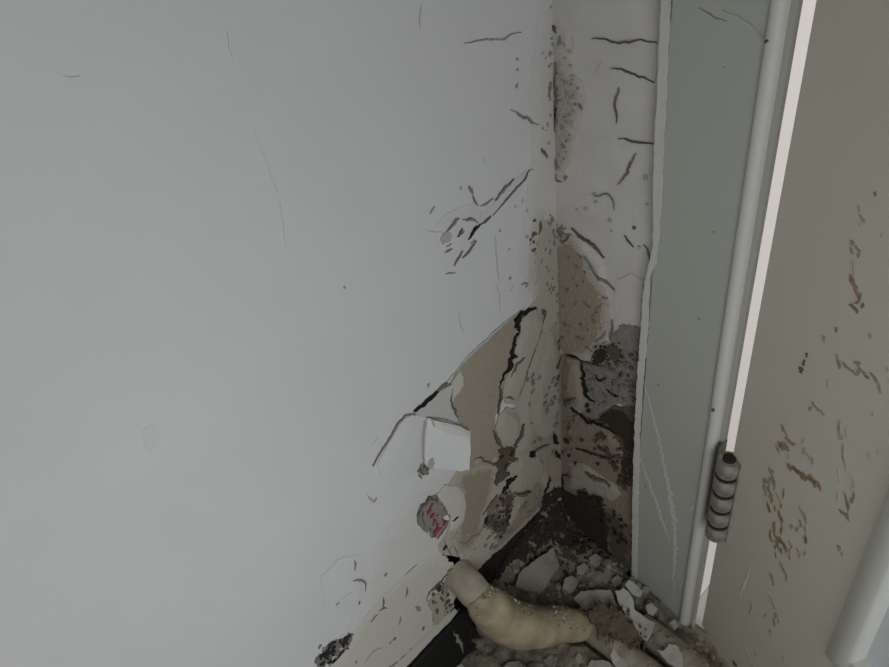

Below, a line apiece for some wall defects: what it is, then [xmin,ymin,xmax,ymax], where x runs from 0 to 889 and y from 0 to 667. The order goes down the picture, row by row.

crack [465,32,522,44]
crack [552,25,657,53]
crack [594,62,655,210]
crack [341,169,549,625]
peeling [413,312,519,471]
damp [337,0,641,640]
crack [561,228,615,319]
spalling [583,273,644,419]
crack [624,235,650,262]
spalling [416,484,466,538]
peeling [314,545,460,667]